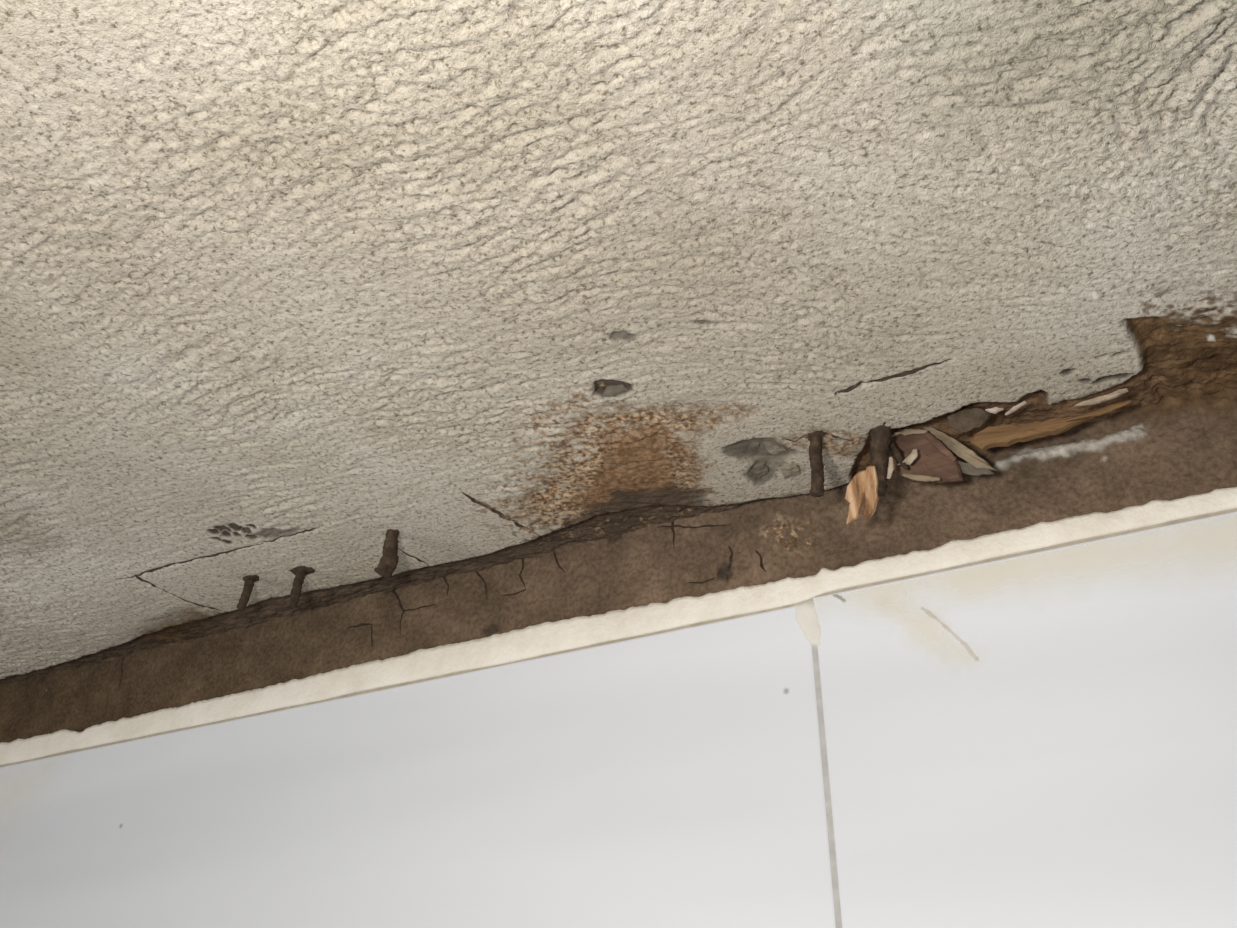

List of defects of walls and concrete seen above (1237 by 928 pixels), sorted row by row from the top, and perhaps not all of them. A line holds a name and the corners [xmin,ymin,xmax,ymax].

spalling [594,379,632,397]
crack [834,359,952,395]
spalling [891,366,1176,476]
corrosion [484,395,745,541]
peeling [724,438,800,484]
spalling [850,434,871,478]
spalling [209,523,256,543]
crack [114,525,324,611]